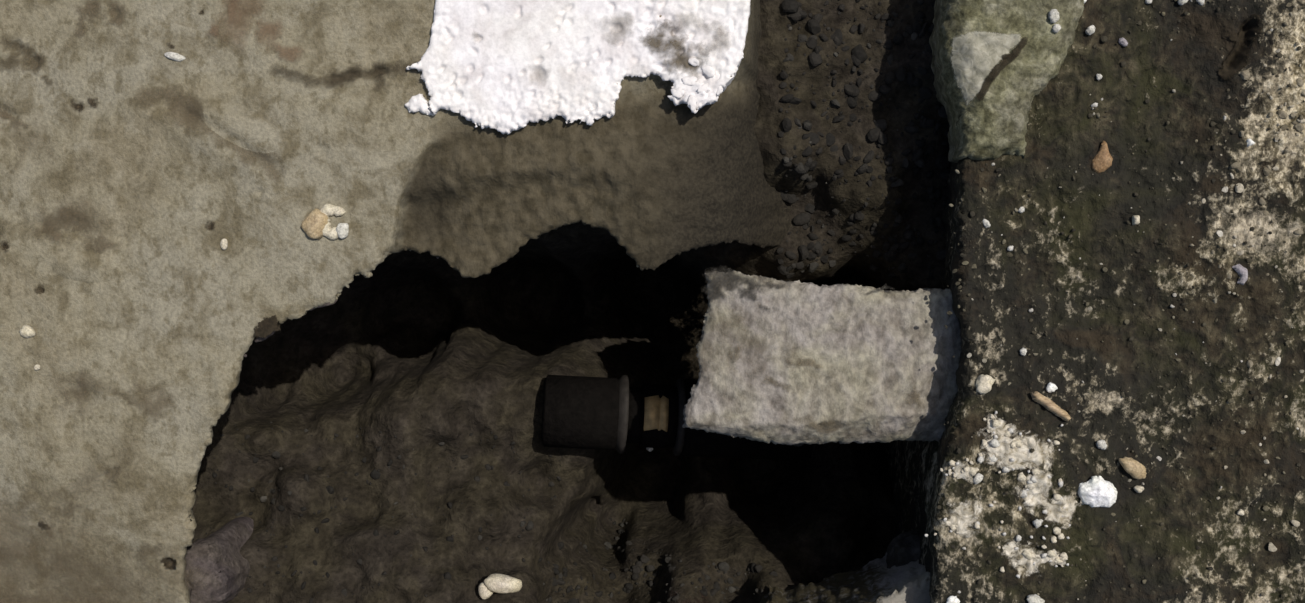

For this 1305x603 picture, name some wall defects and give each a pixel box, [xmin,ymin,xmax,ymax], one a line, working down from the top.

flaking render [405,94,433,115]
spalling [244,315,280,357]
efflorescence [940,411,1084,578]
efflorescence [924,501,997,538]